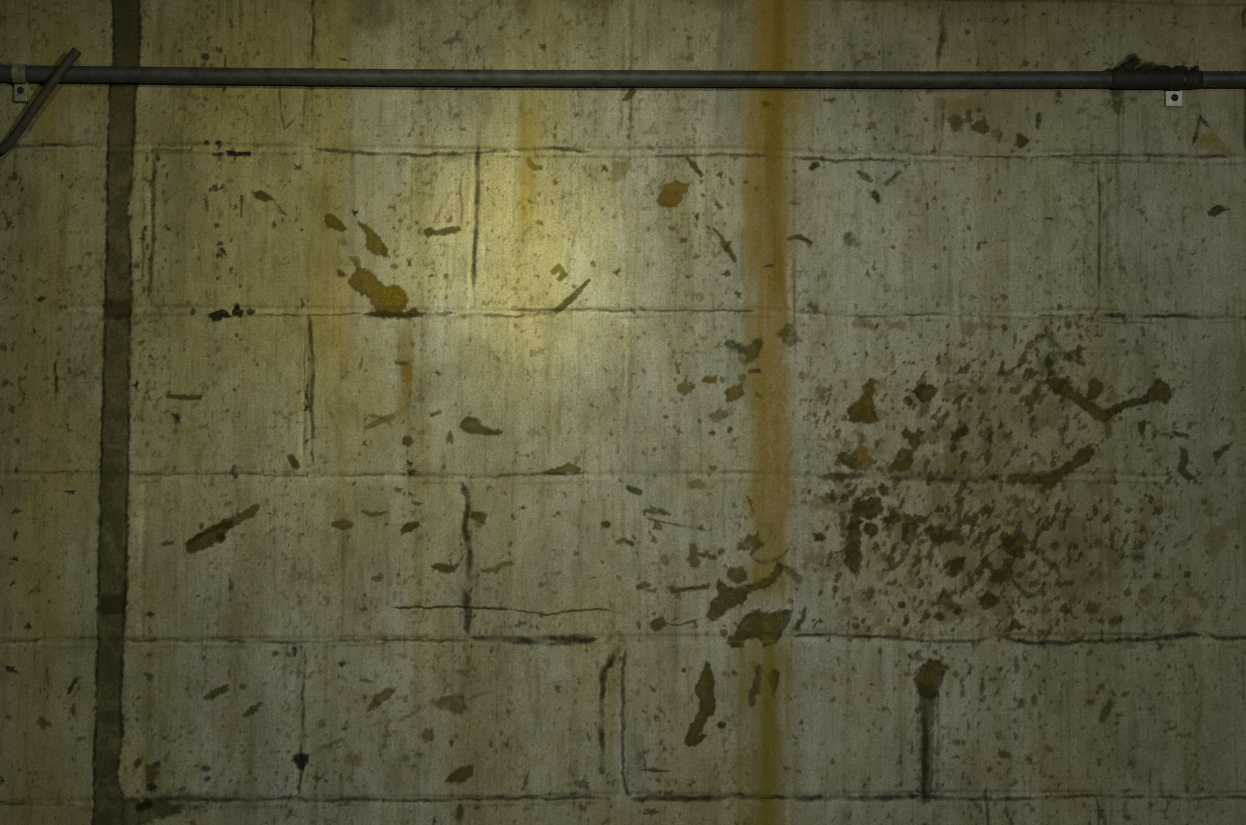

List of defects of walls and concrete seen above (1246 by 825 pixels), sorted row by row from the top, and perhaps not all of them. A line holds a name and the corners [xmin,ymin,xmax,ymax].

crack [402,152,479,274]
crack [395,485,822,801]
crack [1013,633,1246,645]
leakage [910,652,946,803]
crack [859,793,977,801]